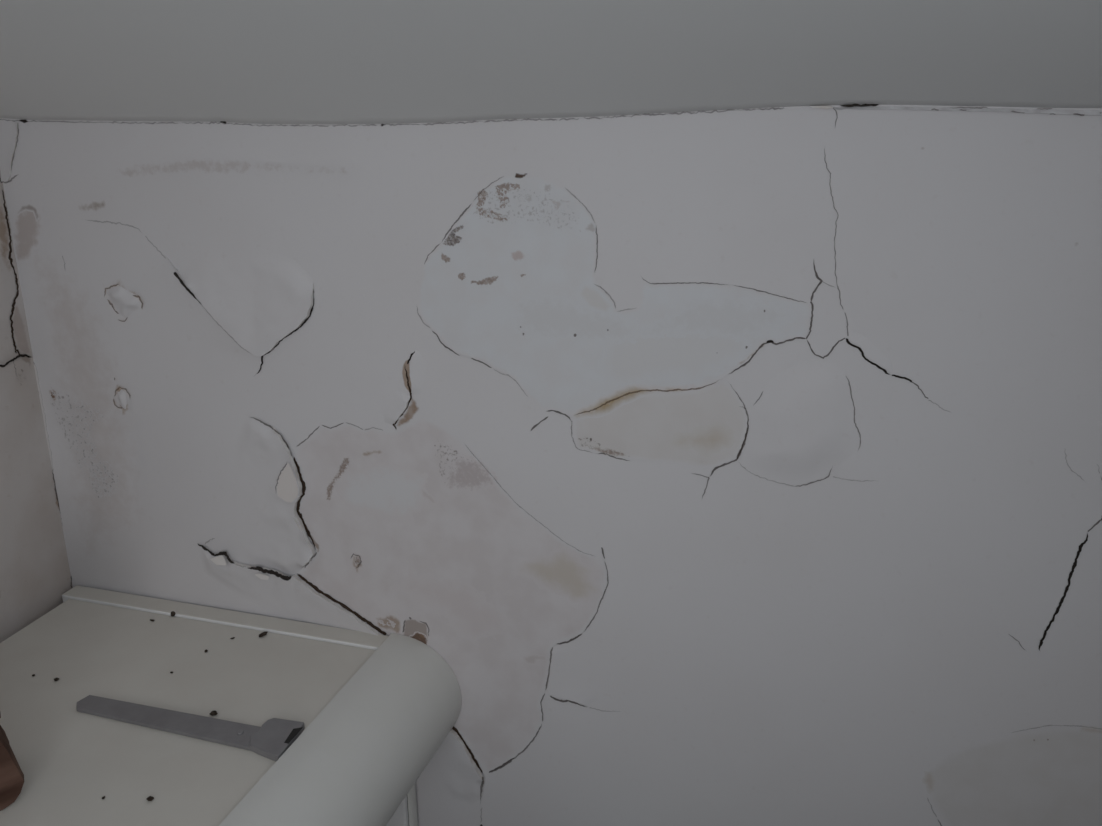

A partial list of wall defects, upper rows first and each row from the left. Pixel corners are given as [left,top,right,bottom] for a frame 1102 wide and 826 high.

crack [0,178,33,369]
crack [531,150,928,497]
crack [1010,518,1102,650]
crack [550,696,585,707]